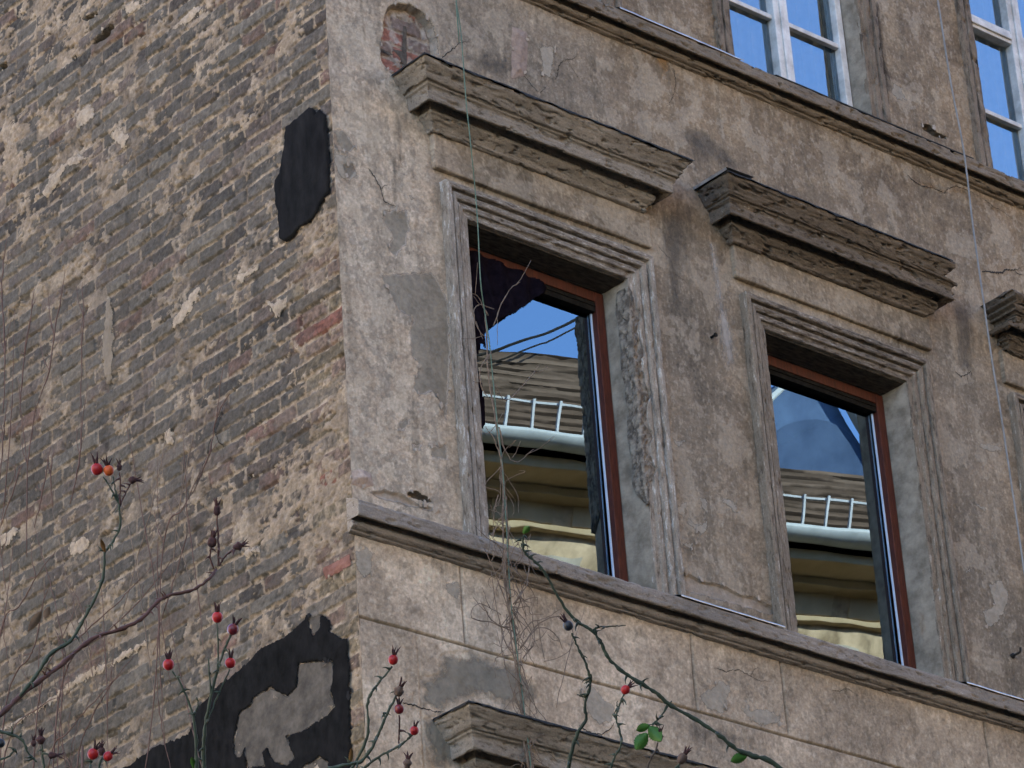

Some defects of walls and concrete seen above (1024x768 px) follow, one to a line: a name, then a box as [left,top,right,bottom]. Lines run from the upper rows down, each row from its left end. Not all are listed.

spalling [82,14,114,44]
spalling [380,1,439,76]
crack [908,175,1011,218]
crack [982,266,1023,275]
spalling [371,488,438,514]